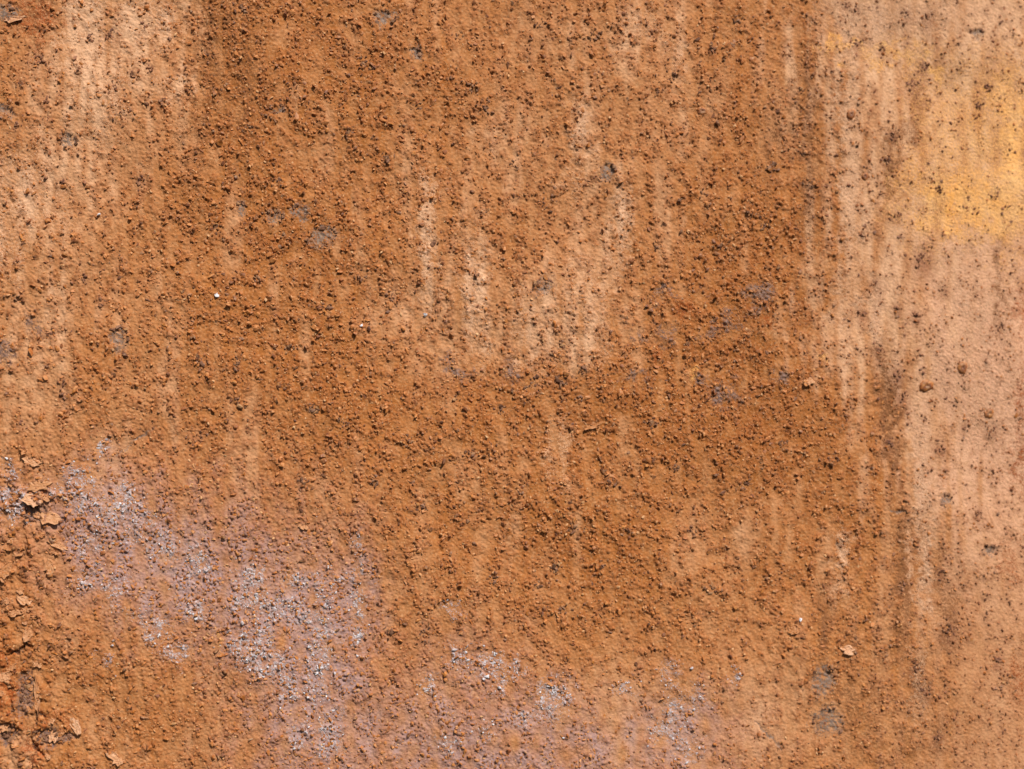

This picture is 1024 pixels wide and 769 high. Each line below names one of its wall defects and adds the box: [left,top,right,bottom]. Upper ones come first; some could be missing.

corrosion [6,0,69,68]
corrosion [170,0,282,243]
corrosion [745,18,831,290]
corrosion [879,63,935,218]
corrosion [523,359,593,394]
corrosion [991,229,1024,496]
water stain [48,438,371,769]
corrosion [810,342,963,769]
corrosion [0,631,73,769]
water stain [429,718,498,762]
water stain [441,640,578,739]
water stain [644,659,715,768]